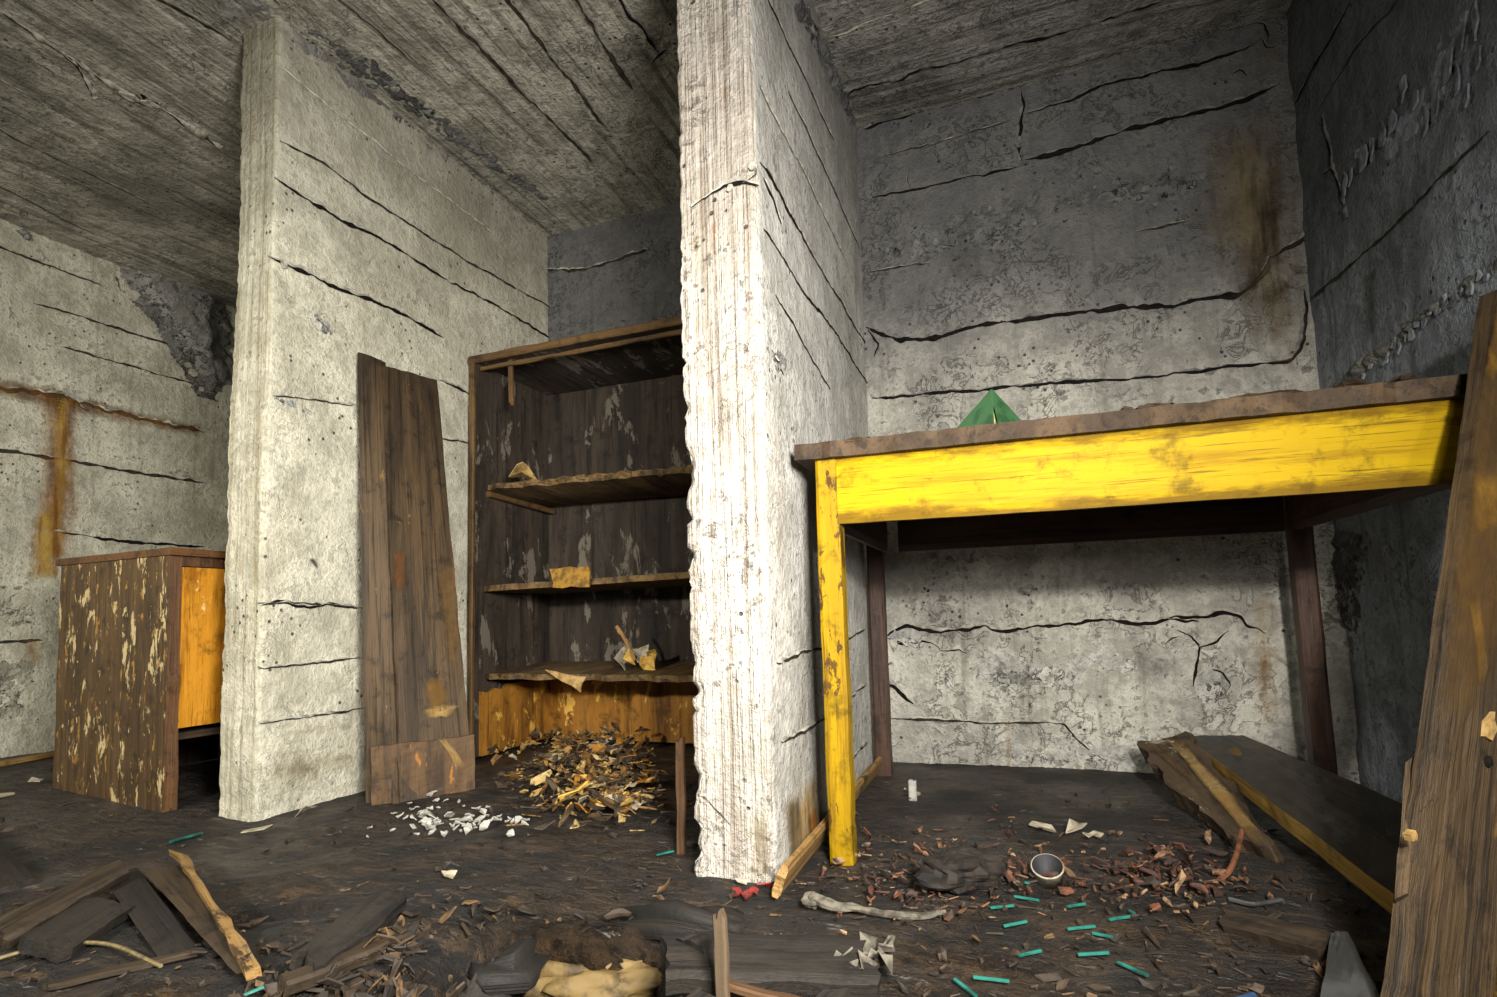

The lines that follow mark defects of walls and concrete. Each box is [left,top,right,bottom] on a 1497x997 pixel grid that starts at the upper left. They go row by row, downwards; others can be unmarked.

crack [847,0,1350,219]
crack [691,162,1309,399]
leakage [1229,141,1284,316]
rust [0,383,197,576]
crack [887,607,1268,704]